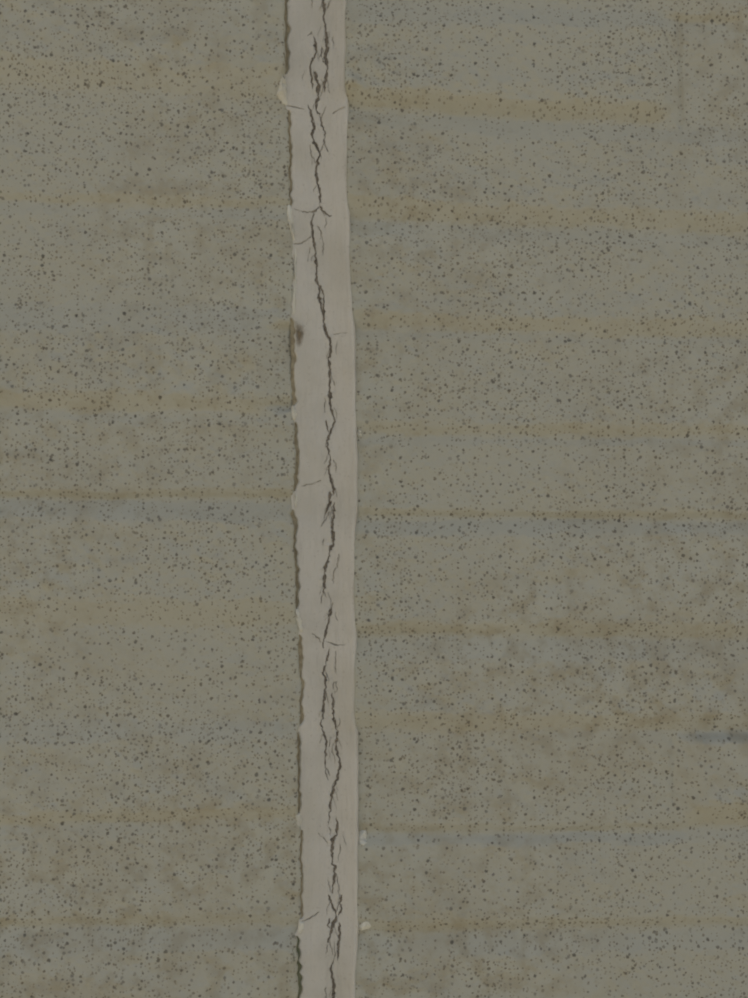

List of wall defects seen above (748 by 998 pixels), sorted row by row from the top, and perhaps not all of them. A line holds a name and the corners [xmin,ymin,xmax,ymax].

crack [291,0,346,998]